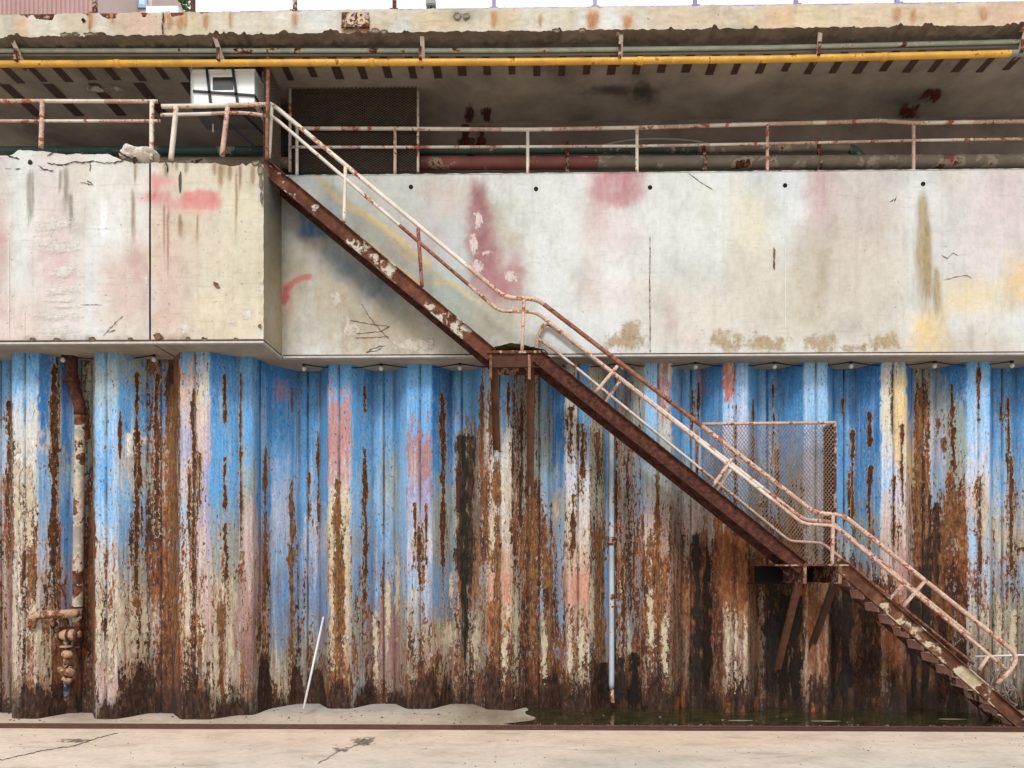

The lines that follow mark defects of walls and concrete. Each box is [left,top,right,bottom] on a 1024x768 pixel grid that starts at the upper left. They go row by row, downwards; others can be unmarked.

crack [351,304,390,353]
leakage [917,198,940,306]
corrosion [3,363,63,668]
peeling [95,550,150,693]
corrosion [117,370,202,659]
peeling [184,558,236,697]
corrosion [286,430,346,662]
peeling [328,483,351,685]
leakage [453,434,477,677]
corrosion [548,351,1024,547]
crack [0,733,117,760]
crack [319,738,374,763]